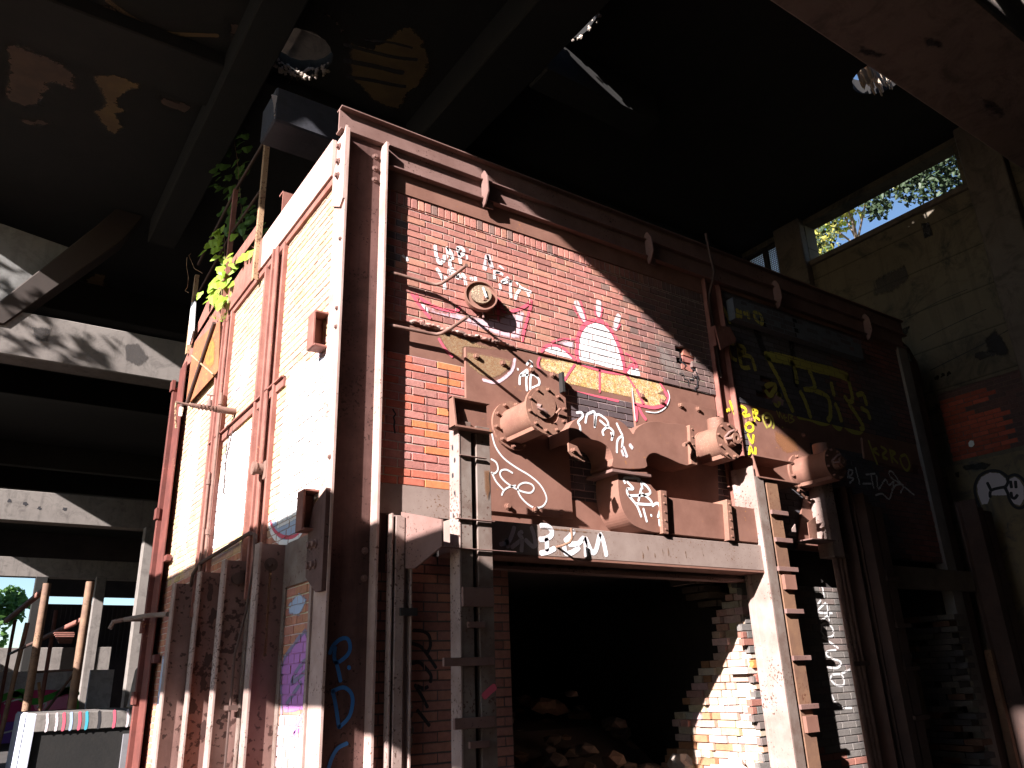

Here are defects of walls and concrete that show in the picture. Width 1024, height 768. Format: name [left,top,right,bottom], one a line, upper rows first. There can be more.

peeling [5,45,77,127]
peeling [93,75,139,134]
peeling [343,27,429,109]
spalling [679,348,693,373]